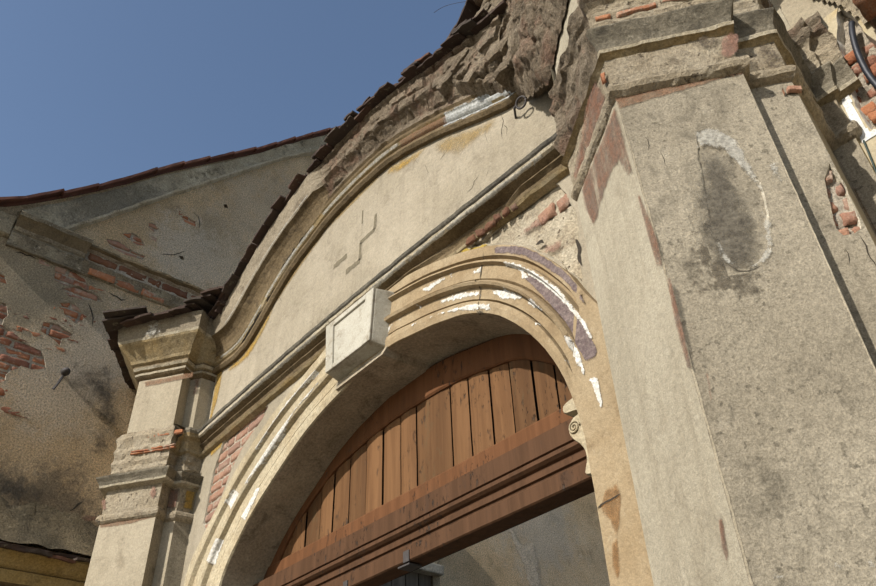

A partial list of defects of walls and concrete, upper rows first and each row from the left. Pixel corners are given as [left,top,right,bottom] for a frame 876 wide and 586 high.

flaking render [836,7,876,143]
peeling [369,154,543,290]
flaking render [461,184,582,281]
water stain [699,158,758,269]
flaking render [824,163,861,235]
flaking render [0,253,196,419]
peeling [441,291,491,315]
peeling [493,287,542,310]
peeling [503,262,592,338]
peeling [564,336,602,406]
flaking render [203,370,319,530]
peeling [207,538,224,565]